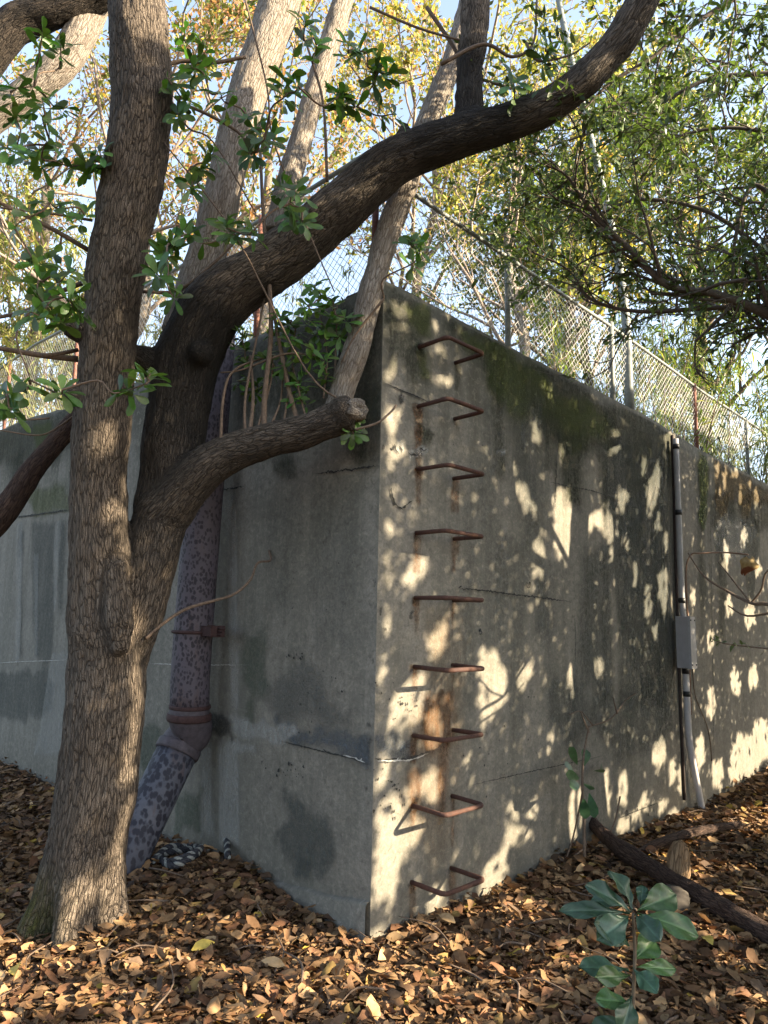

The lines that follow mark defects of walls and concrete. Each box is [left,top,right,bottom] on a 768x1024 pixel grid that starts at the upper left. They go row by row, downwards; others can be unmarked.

crack [316,444,425,474]
damp [452,322,672,755]
crack [459,586,576,656]
damp [175,714,425,843]
crack [282,741,426,765]